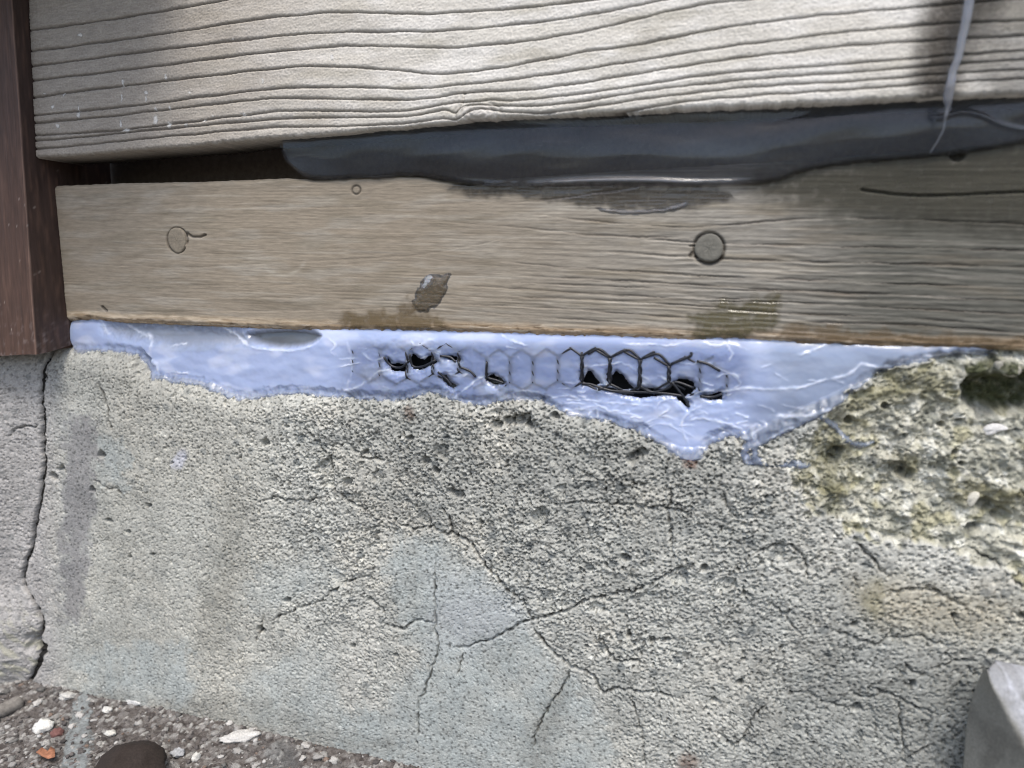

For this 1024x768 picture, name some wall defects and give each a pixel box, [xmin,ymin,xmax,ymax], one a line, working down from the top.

crack [21,358,52,679]
crack [401,509,675,743]
crack [612,478,682,541]
spalling [788,350,1024,592]
crack [859,544,957,642]